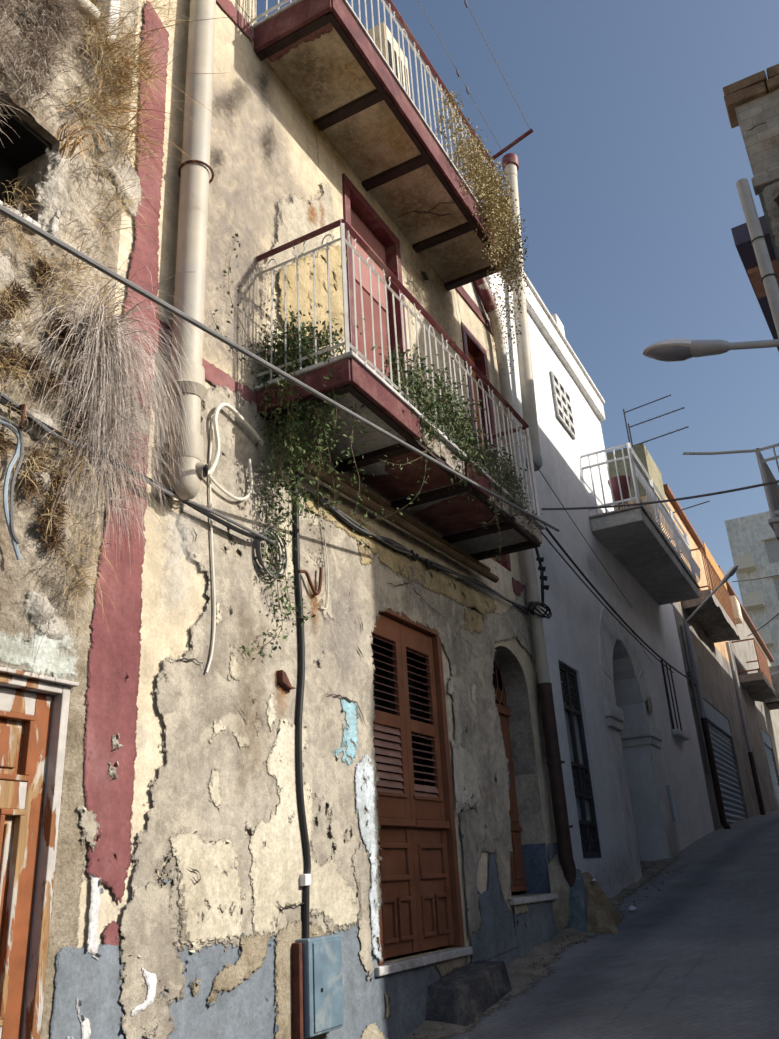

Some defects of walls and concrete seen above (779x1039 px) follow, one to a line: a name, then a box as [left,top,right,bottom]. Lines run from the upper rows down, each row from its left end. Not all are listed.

crack [397,202,455,218]
flaking render [24,584,68,640]
peeling [117,384,542,1039]
spalling [107,732,123,781]
spalling [77,805,102,851]
peeling [86,874,104,960]
peeling [68,997,91,1039]